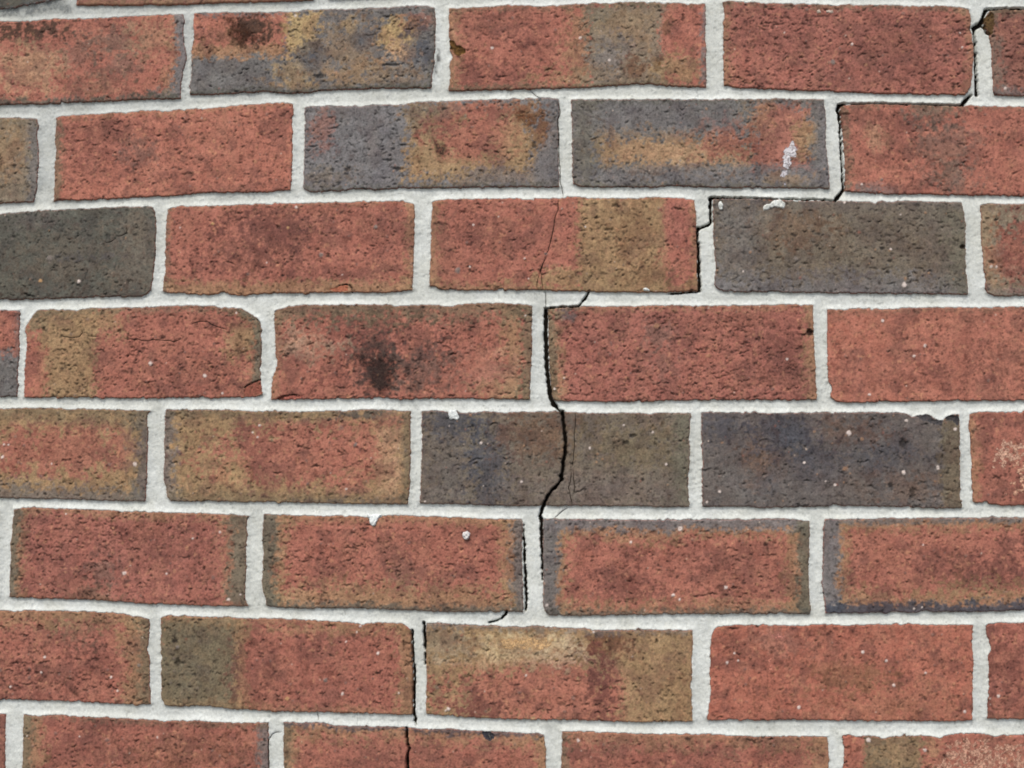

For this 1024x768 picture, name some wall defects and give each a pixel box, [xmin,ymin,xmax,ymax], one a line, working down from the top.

crack [670,8,1020,295]
crack [490,93,589,623]
crack [406,622,427,768]